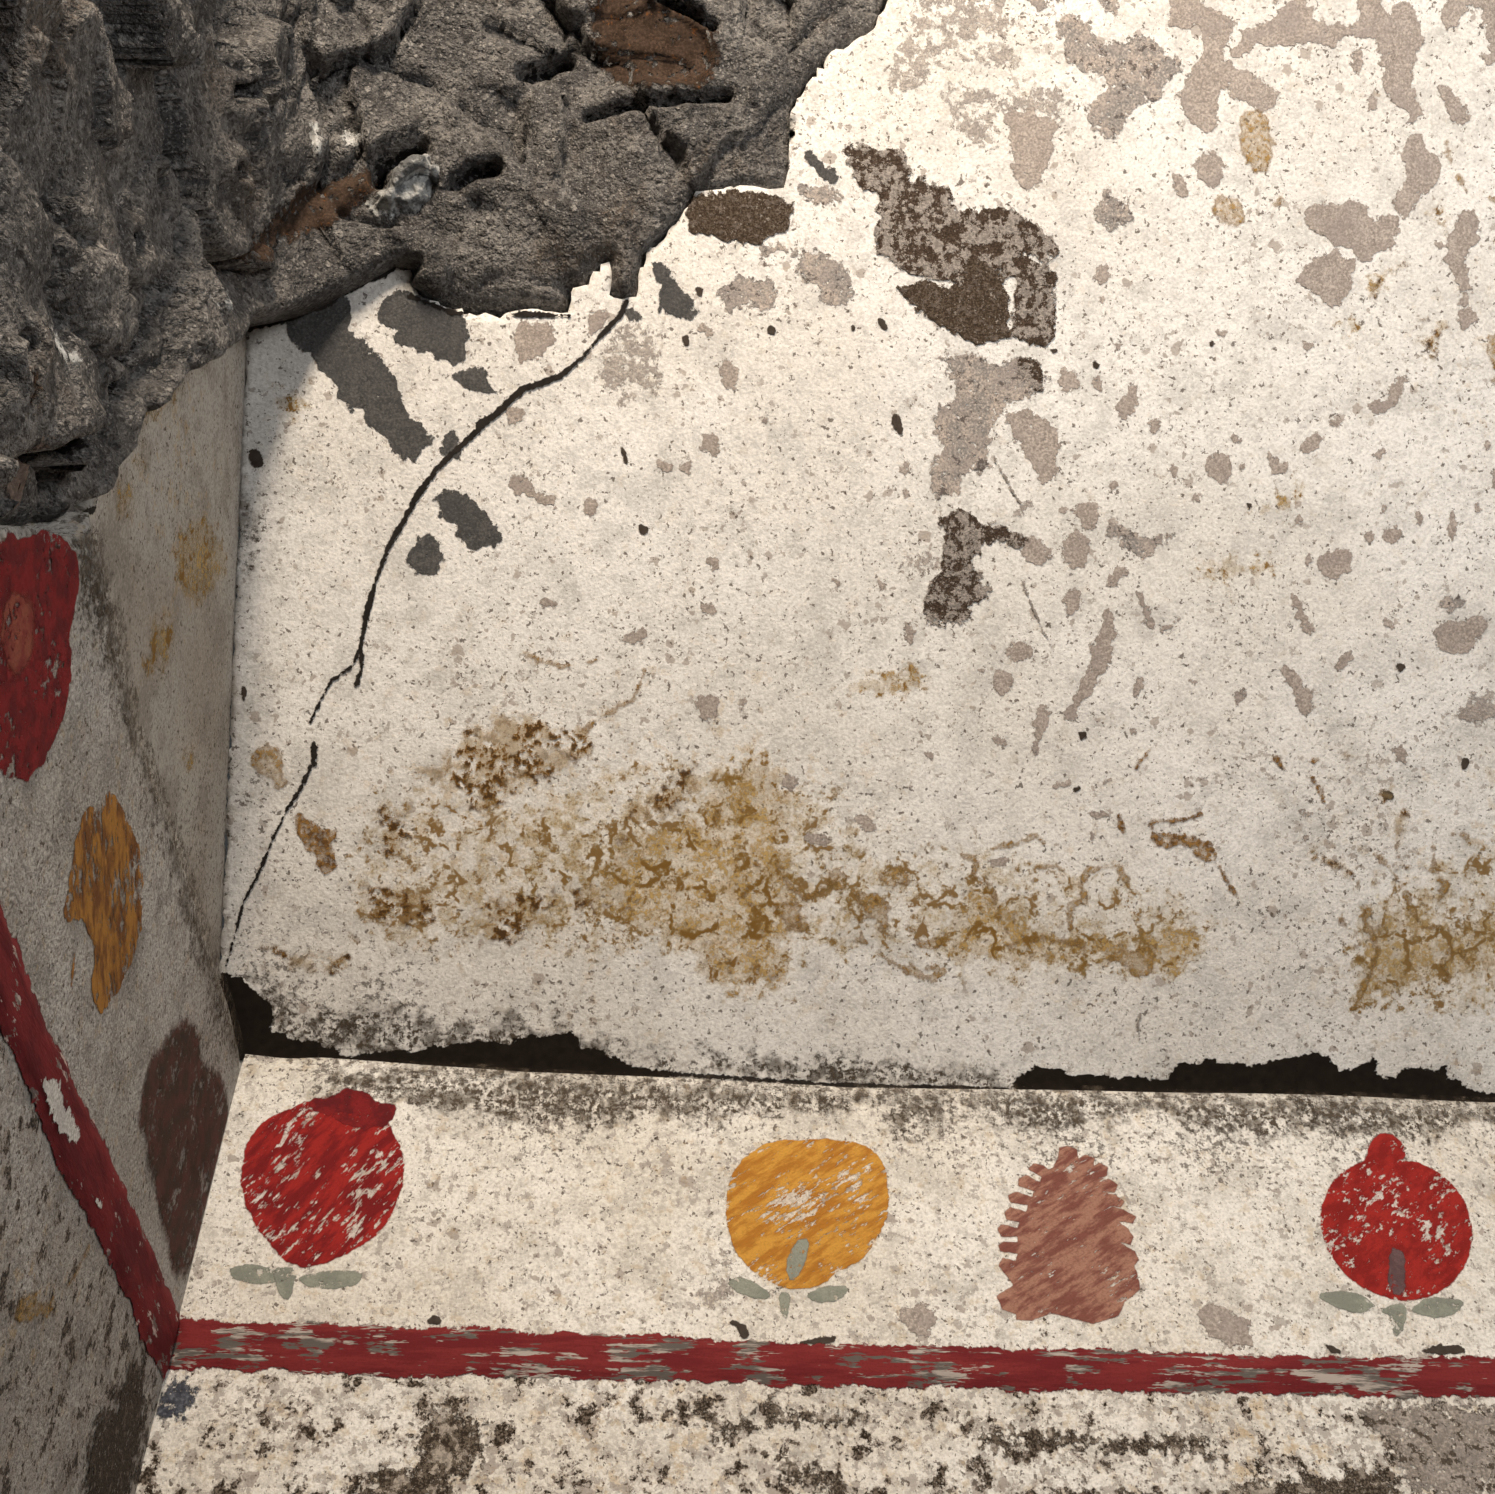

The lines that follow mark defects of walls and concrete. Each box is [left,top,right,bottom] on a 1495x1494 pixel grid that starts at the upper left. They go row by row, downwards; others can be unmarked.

peeling [940,0,1442,308]
crack [247,267,467,332]
spalling [0,0,1180,646]
peeling [1434,209,1482,330]
crack [83,500,97,515]
crack [225,299,629,966]
peeling [1031,608,1118,755]
leakage [501,756,738,961]
leakage [734,773,1213,976]
leakage [1343,842,1495,1014]
spalling [220,972,671,1078]
spalling [1013,1052,1495,1102]